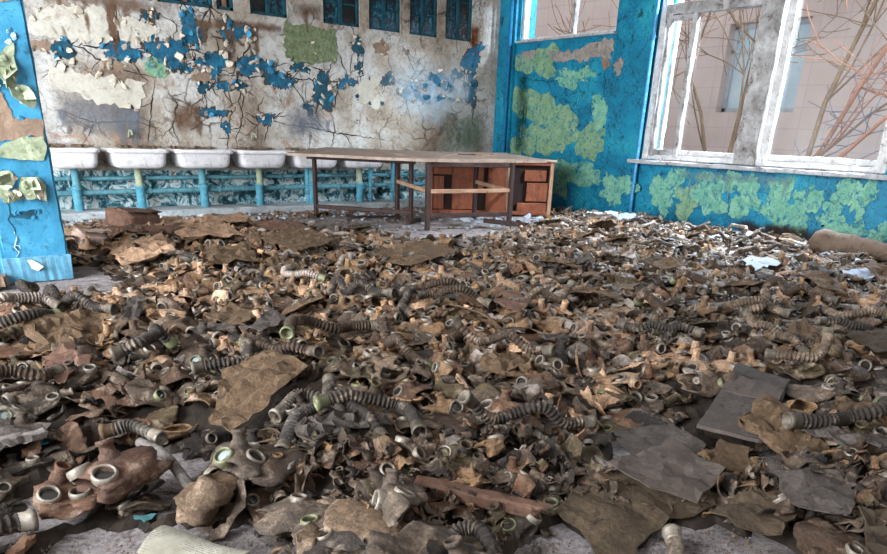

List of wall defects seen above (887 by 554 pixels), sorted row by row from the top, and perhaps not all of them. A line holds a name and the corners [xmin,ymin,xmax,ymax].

crack [64,8,425,147]
peeling [30,0,485,150]
flaking render [522,37,624,76]
flaking render [460,206,616,230]
flaking render [686,226,807,263]